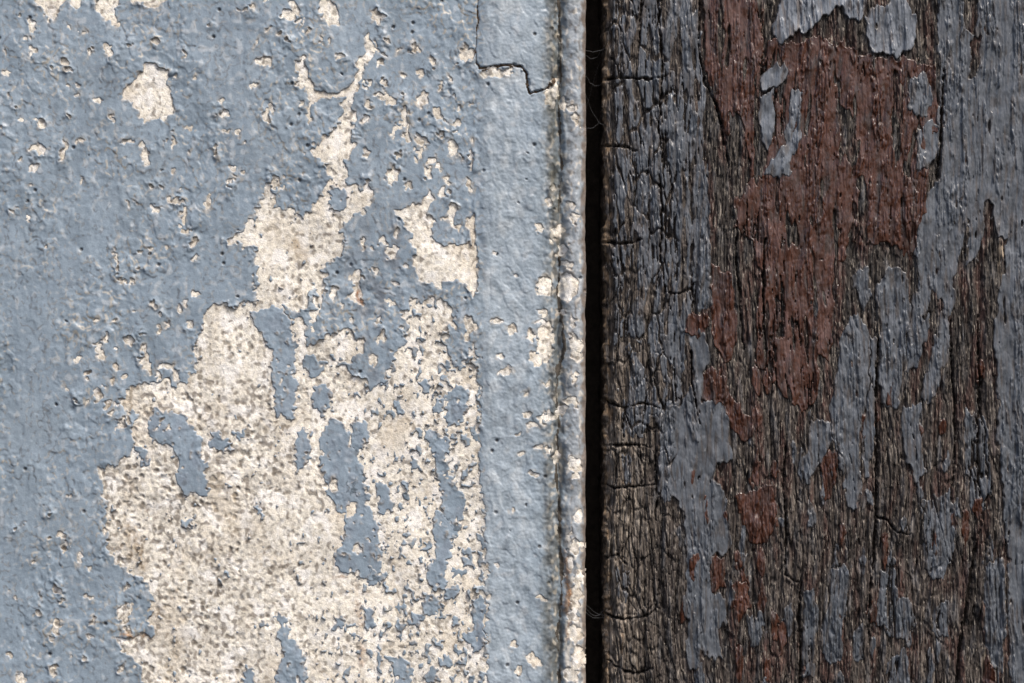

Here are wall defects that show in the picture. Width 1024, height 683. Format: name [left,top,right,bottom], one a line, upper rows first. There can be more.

peeling [19,143,46,186]
peeling [19,0,81,56]
crack [474,0,564,211]
peeling [73,0,499,683]
peeling [611,0,1024,683]
peeling [48,531,92,572]
crack [554,256,566,683]
peeling [510,640,543,676]